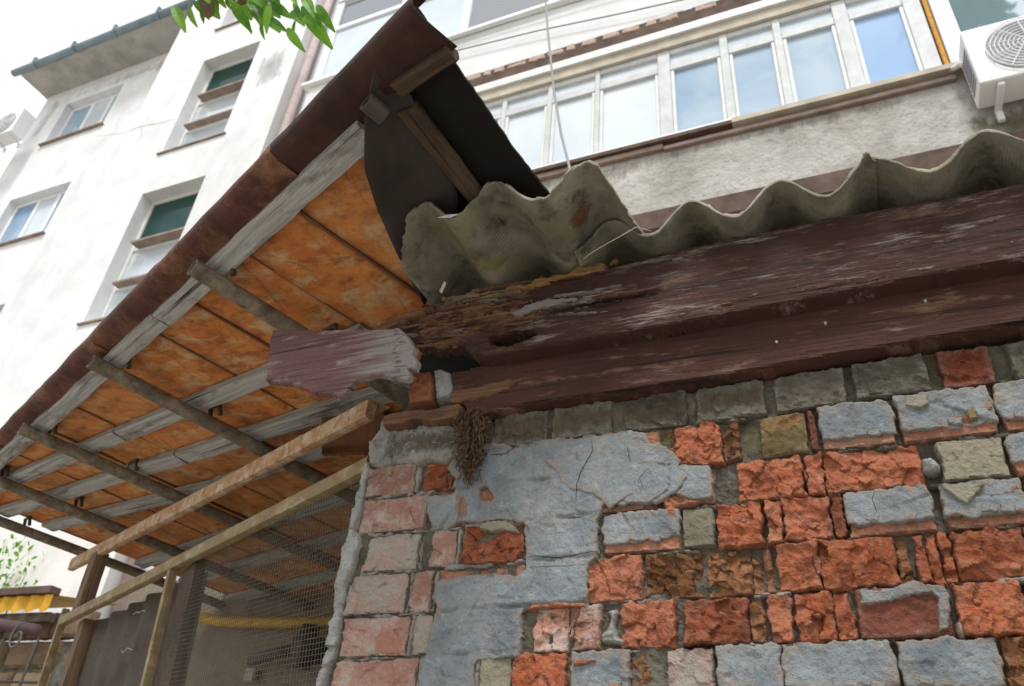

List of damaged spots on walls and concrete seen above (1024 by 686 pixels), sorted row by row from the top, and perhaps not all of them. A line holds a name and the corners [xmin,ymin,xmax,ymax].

peeling [418,379,1024,686]